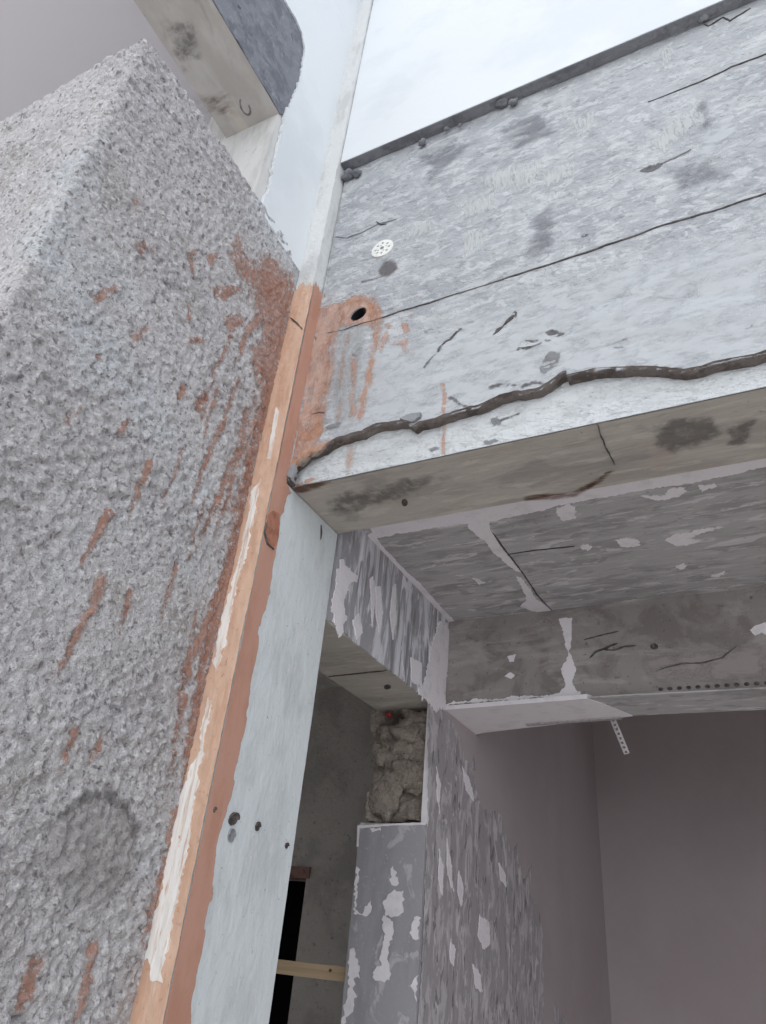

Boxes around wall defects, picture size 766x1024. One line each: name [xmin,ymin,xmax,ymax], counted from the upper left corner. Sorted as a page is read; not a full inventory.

crack [648,53,766,102]
crack [328,193,766,335]
crack [424,328,462,368]
crack [286,350,766,487]
corrosion [81,509,114,564]
crack [490,529,574,611]
corrosion [59,573,108,670]
corrosion [129,237,409,1024]
crack [584,631,636,658]
crack [656,645,737,672]
corrosion [61,728,78,763]
peeling [330,458,766,1024]